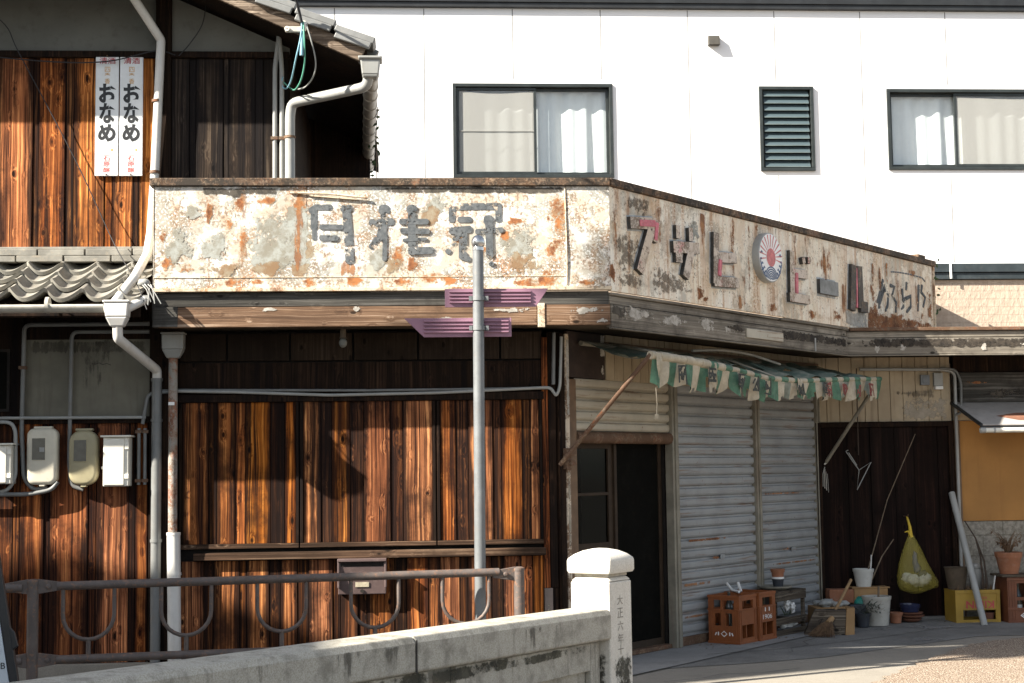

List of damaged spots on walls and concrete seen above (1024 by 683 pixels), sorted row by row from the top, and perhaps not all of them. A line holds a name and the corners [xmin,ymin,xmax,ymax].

peeling [627,197,649,216]
peeling [164,205,316,277]
corrosion [293,194,316,287]
corrosion [341,260,363,286]
peeling [367,246,403,273]
corrosion [500,217,526,241]
corrosion [513,198,595,286]
peeling [617,234,690,294]
corrosion [834,263,1024,331]
peeling [624,306,735,333]
leakage [381,648,585,683]
leakage [600,655,632,683]